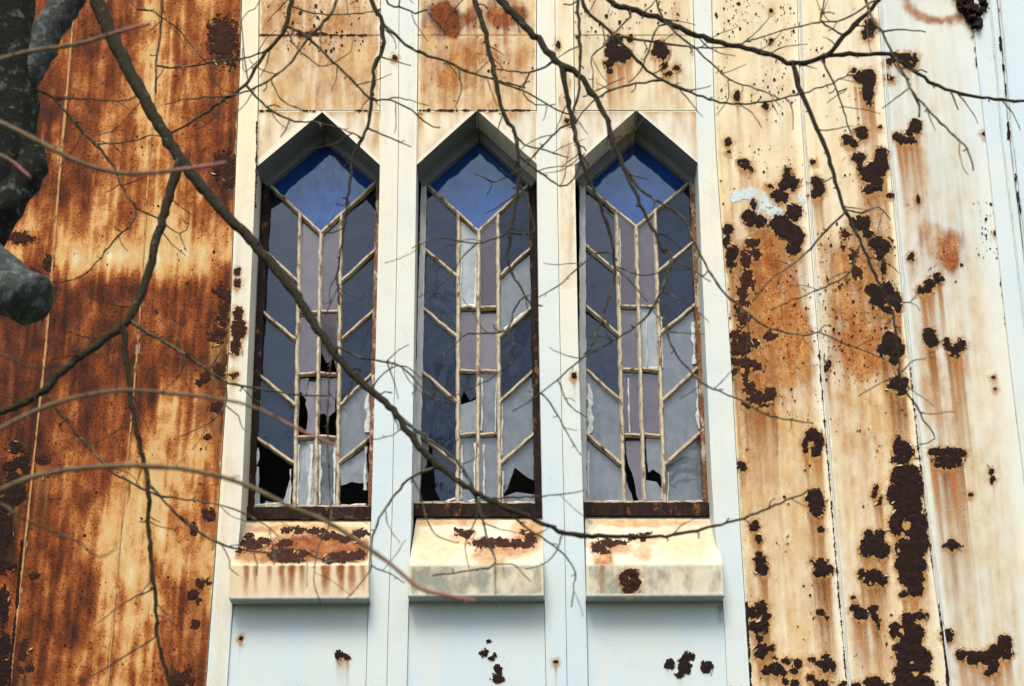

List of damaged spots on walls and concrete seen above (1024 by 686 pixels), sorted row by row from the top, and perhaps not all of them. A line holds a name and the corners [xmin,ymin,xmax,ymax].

rust [418,0,535,127]
rust [597,31,633,101]
rust [650,38,682,79]
rust [955,0,990,66]
peeling [729,186,783,218]
rust [0,0,248,686]
rust [721,50,974,686]
rust [235,520,368,586]
rust [617,568,642,594]
rust [478,639,505,684]
rust [664,650,714,678]
rust [939,628,1015,686]